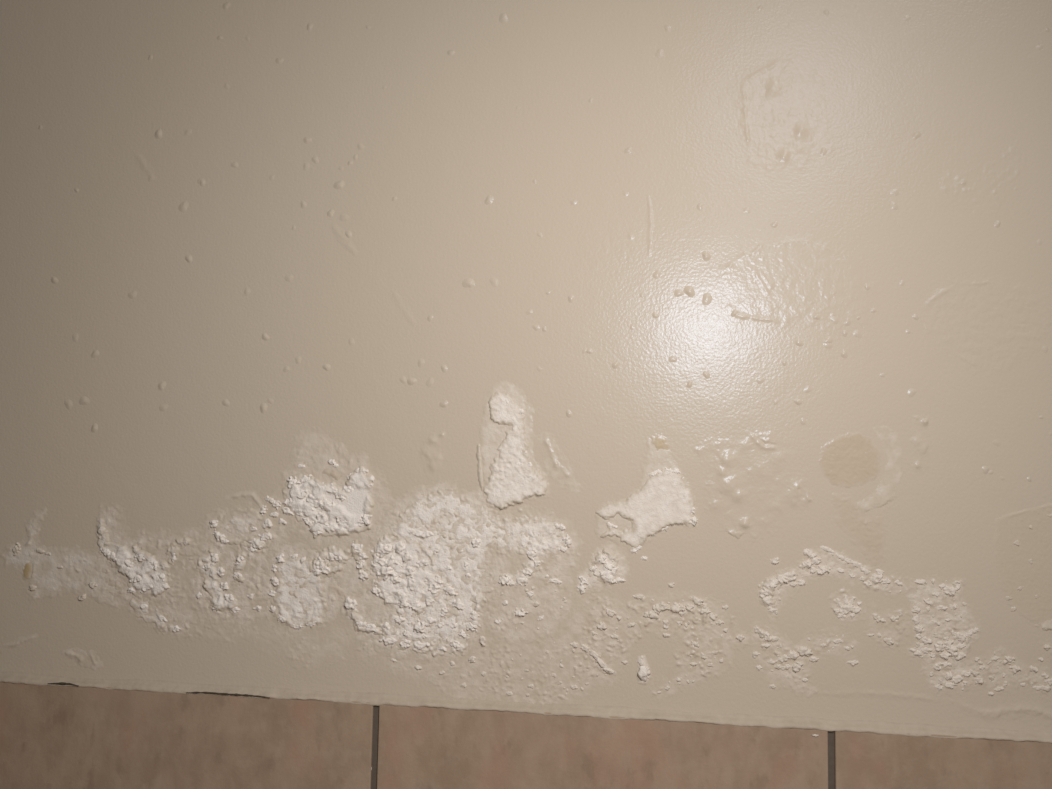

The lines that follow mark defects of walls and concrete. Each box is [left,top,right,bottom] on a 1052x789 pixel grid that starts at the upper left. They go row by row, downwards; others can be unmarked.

peeling [476,380,552,510]
peeling [593,433,699,560]
water stain [90,426,1052,705]